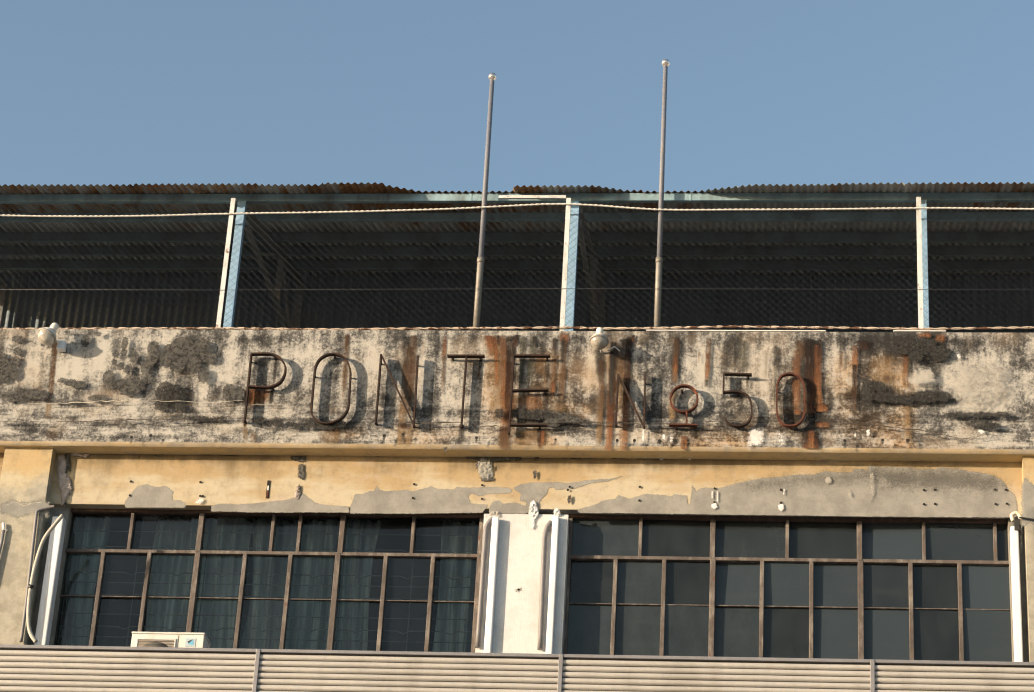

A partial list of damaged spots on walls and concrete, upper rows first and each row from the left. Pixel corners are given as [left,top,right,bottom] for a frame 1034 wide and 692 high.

leakage [0,335,230,423]
leakage [222,384,245,402]
corrosion [478,333,567,449]
corrosion [595,335,635,450]
corrosion [793,338,829,449]
leakage [886,336,955,368]
leakage [860,376,1011,429]
peeling [125,484,186,508]
peeling [211,456,1034,545]